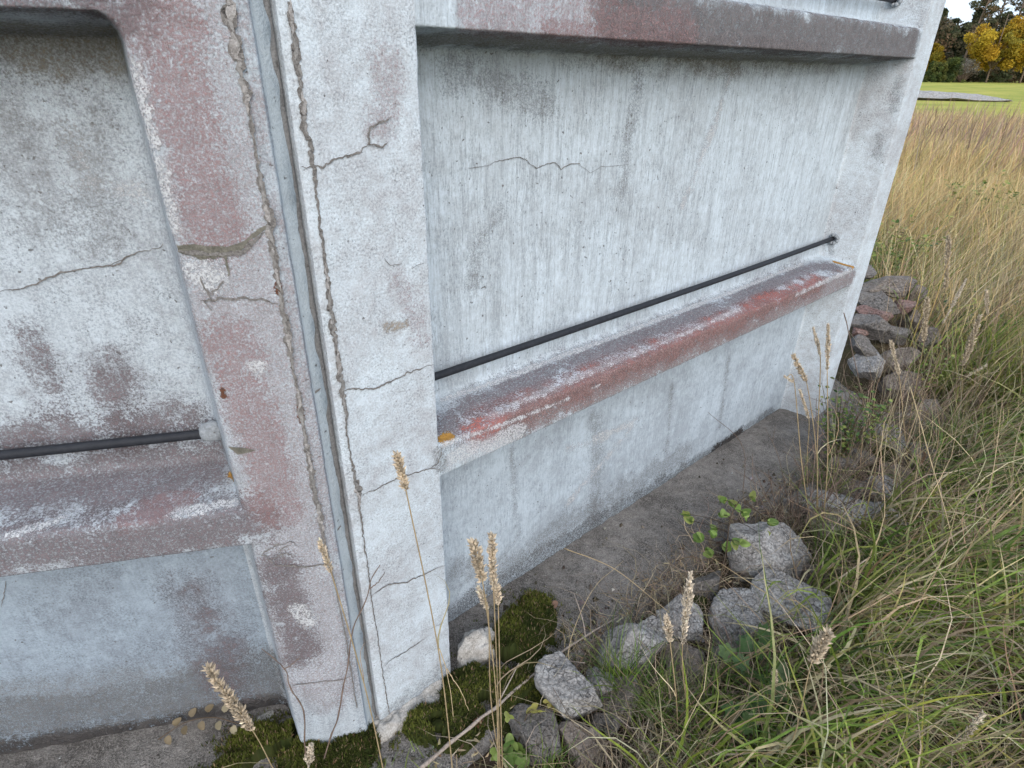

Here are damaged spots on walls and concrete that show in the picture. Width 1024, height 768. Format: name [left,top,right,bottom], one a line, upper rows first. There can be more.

crack [302,116,392,169]
crack [473,157,629,172]
crack [0,244,163,292]
crack [200,277,278,311]
crack [315,364,433,394]
rust [204,316,300,525]
crack [363,447,443,495]
crack [262,541,325,568]
crack [370,566,441,596]